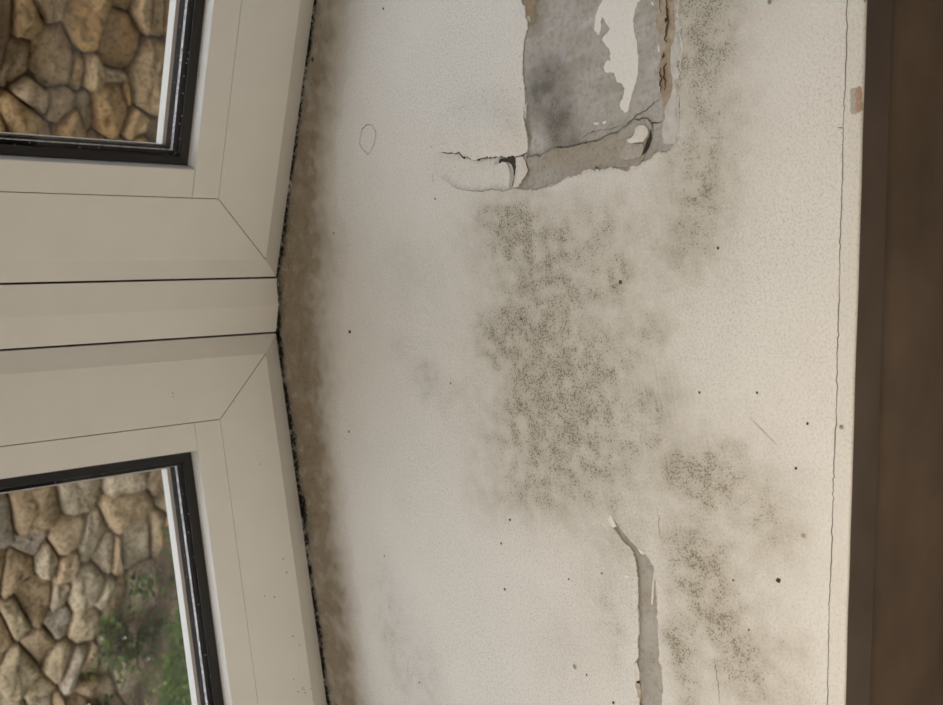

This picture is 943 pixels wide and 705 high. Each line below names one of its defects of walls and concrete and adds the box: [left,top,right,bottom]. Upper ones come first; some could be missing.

peeling [509,0,683,190]
damp [667,0,747,264]
damp [274,0,355,705]
damp [475,192,673,533]
peeling [607,514,663,705]
damp [661,445,792,705]